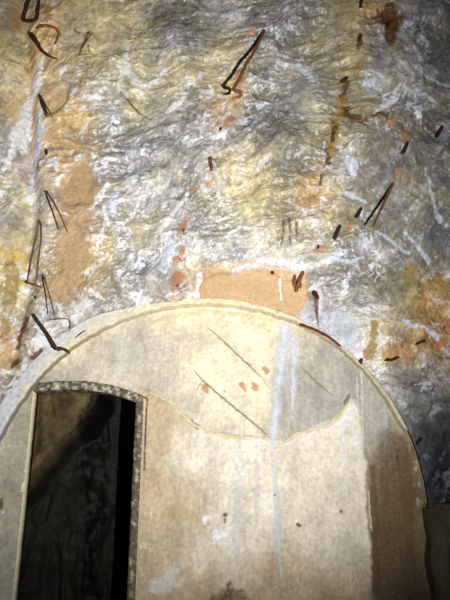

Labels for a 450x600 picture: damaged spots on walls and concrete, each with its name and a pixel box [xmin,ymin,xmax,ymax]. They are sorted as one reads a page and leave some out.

corrosion [373,3,405,46]
corrosion [39,161,100,302]
corrosion [16,316,29,350]
crack [209,329,268,387]
crack [195,372,266,434]
water stain [270,323,298,453]
peeling [284,394,364,443]